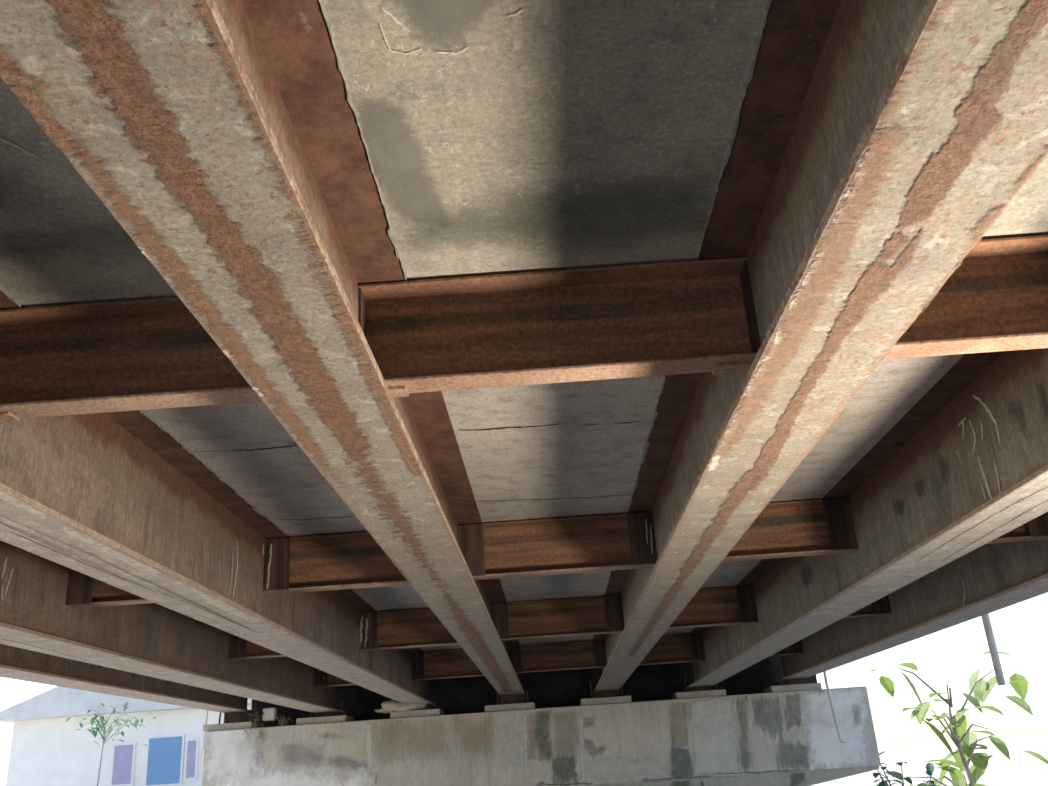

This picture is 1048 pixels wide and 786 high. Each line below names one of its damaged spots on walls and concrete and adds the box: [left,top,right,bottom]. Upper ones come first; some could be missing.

damp [397,0,490,46]
damp [362,105,448,226]
rust [0,0,513,693]
rust [629,0,1048,656]
crack [462,423,558,431]
damp [505,688,869,786]